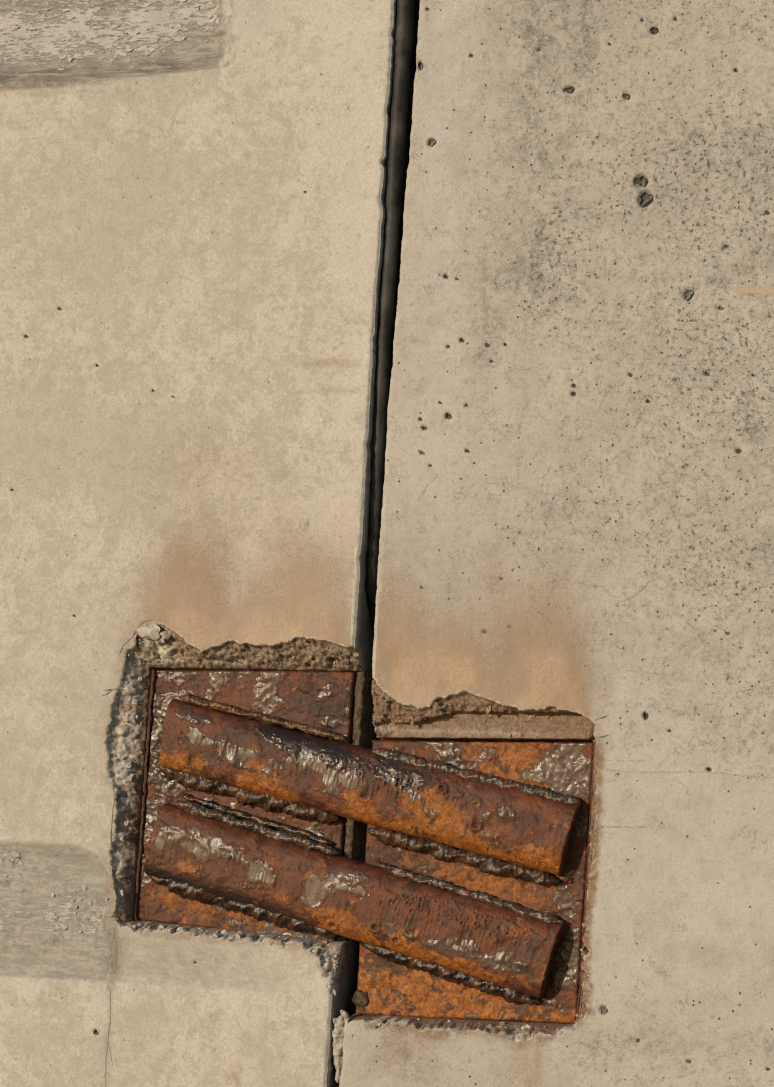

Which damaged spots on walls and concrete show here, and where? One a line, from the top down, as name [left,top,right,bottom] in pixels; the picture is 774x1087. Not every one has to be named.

rust [147,549,350,650]
rust [375,600,588,717]
spalling [0,623,598,1043]